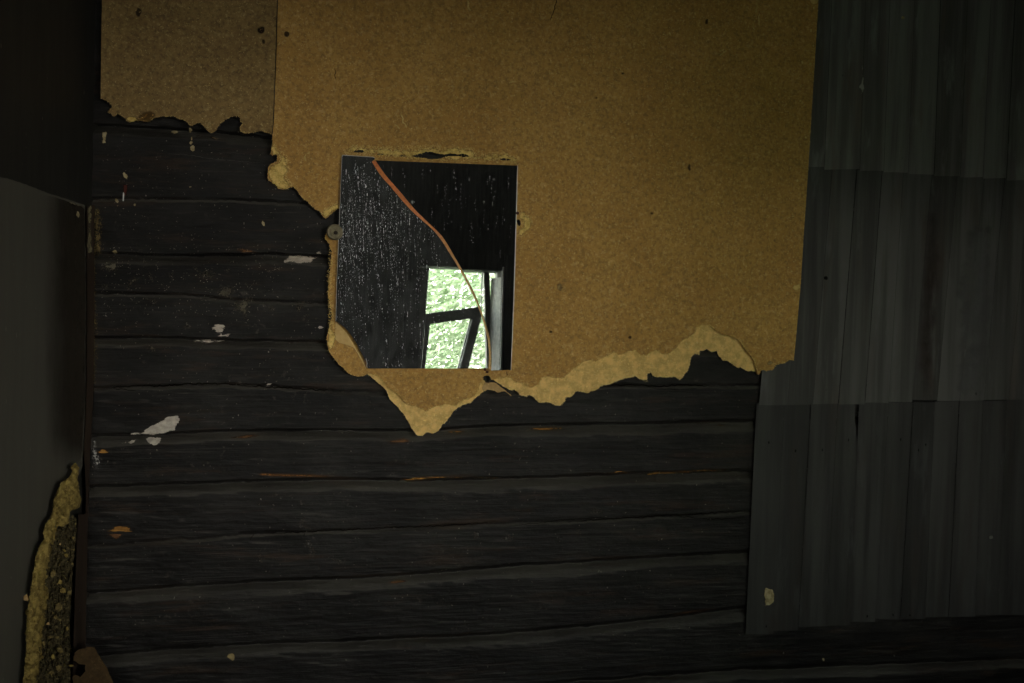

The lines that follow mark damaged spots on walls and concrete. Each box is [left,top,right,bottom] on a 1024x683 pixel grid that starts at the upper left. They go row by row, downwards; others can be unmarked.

peeling [368,325,759,436]
spalling [36,515,77,683]